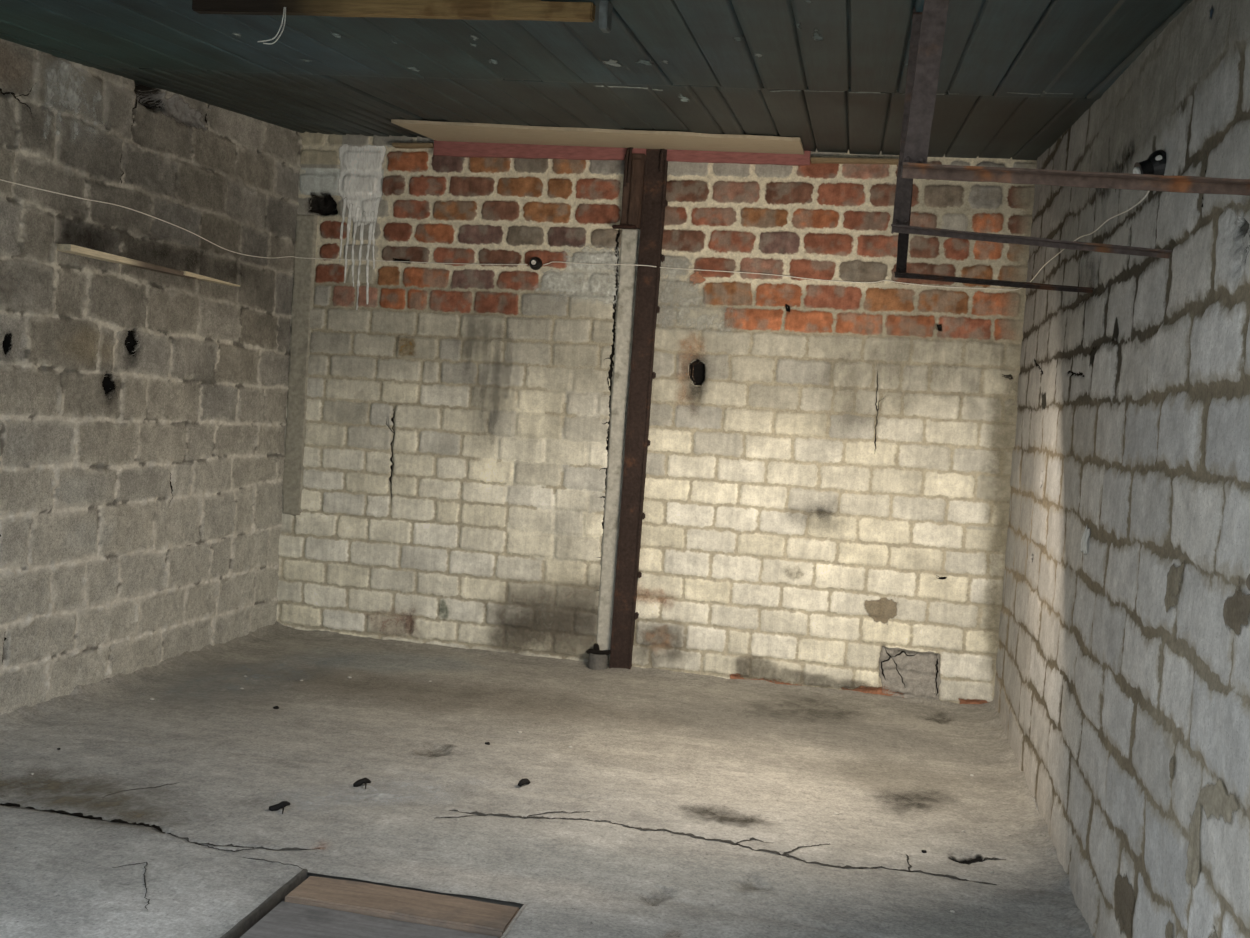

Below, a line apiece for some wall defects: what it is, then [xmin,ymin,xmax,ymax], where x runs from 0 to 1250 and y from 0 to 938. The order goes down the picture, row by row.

damp [338,144,386,310]
damp [494,588,597,656]
crack [0,783,319,869]
crack [436,810,1006,885]
crack [112,862,150,910]